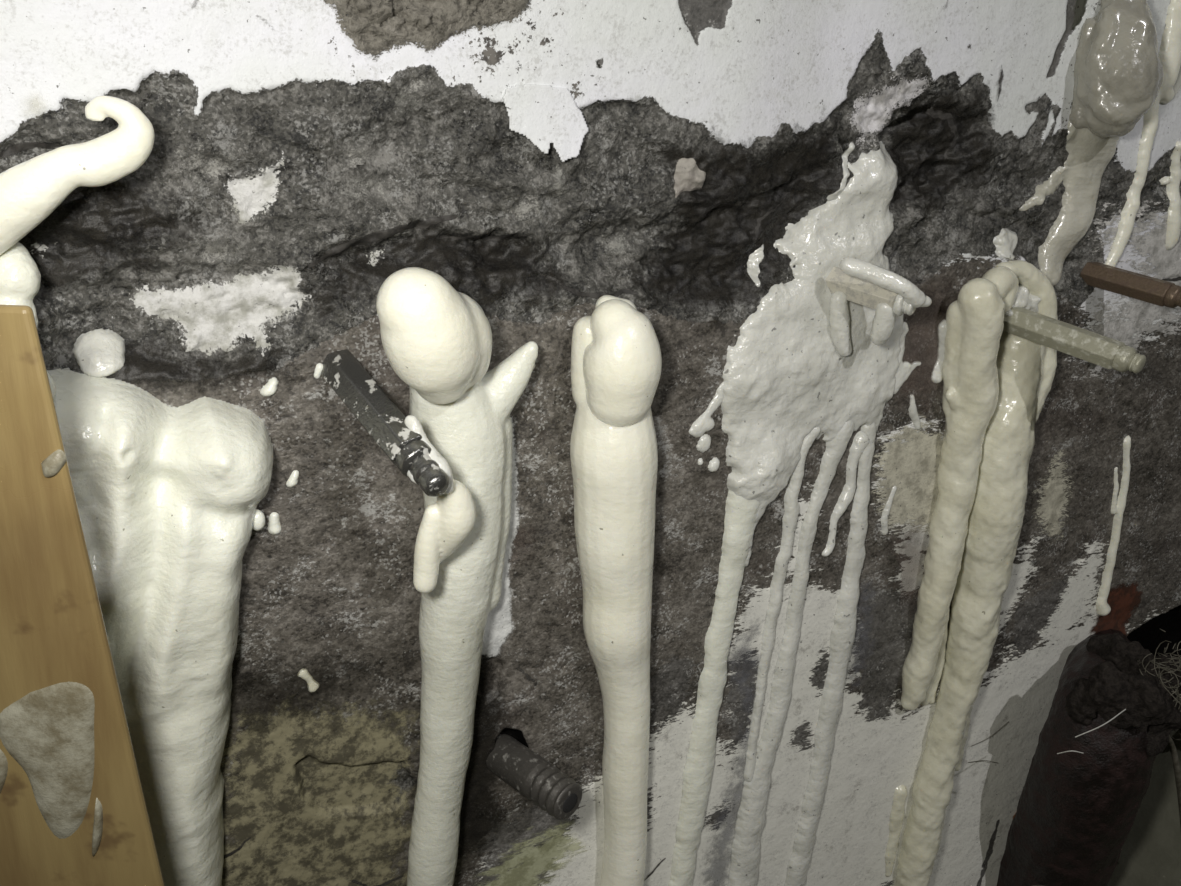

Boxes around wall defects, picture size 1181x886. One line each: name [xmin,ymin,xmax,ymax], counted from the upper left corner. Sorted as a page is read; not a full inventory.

peeling [462,19,536,82]
peeling [678,0,732,45]
spalling [0,98,118,173]
spalling [1053,146,1181,330]
spalling [18,29,1069,804]
peeling [981,315,1181,687]
corrosion [1090,582,1142,636]
peeling [384,783,417,886]
peeling [453,768,583,886]
peeling [647,783,661,832]
peeling [703,799,735,831]
peeling [977,820,1000,886]